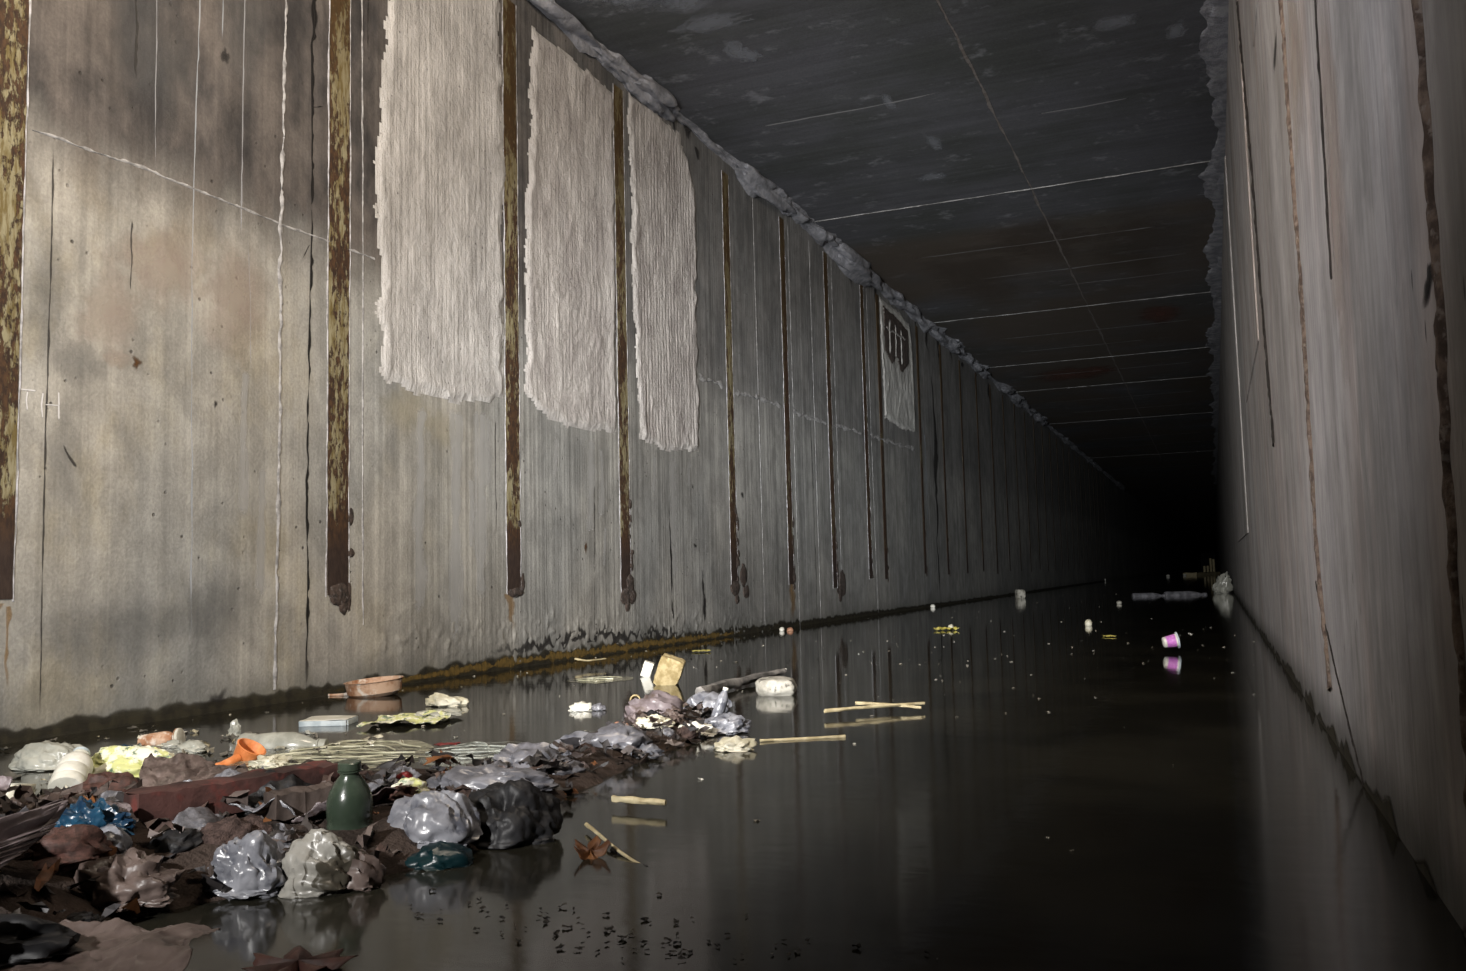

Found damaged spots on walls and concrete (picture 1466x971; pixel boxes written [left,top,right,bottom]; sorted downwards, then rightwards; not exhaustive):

spalling [883,305,909,372]
corrosion [0,604,11,662]